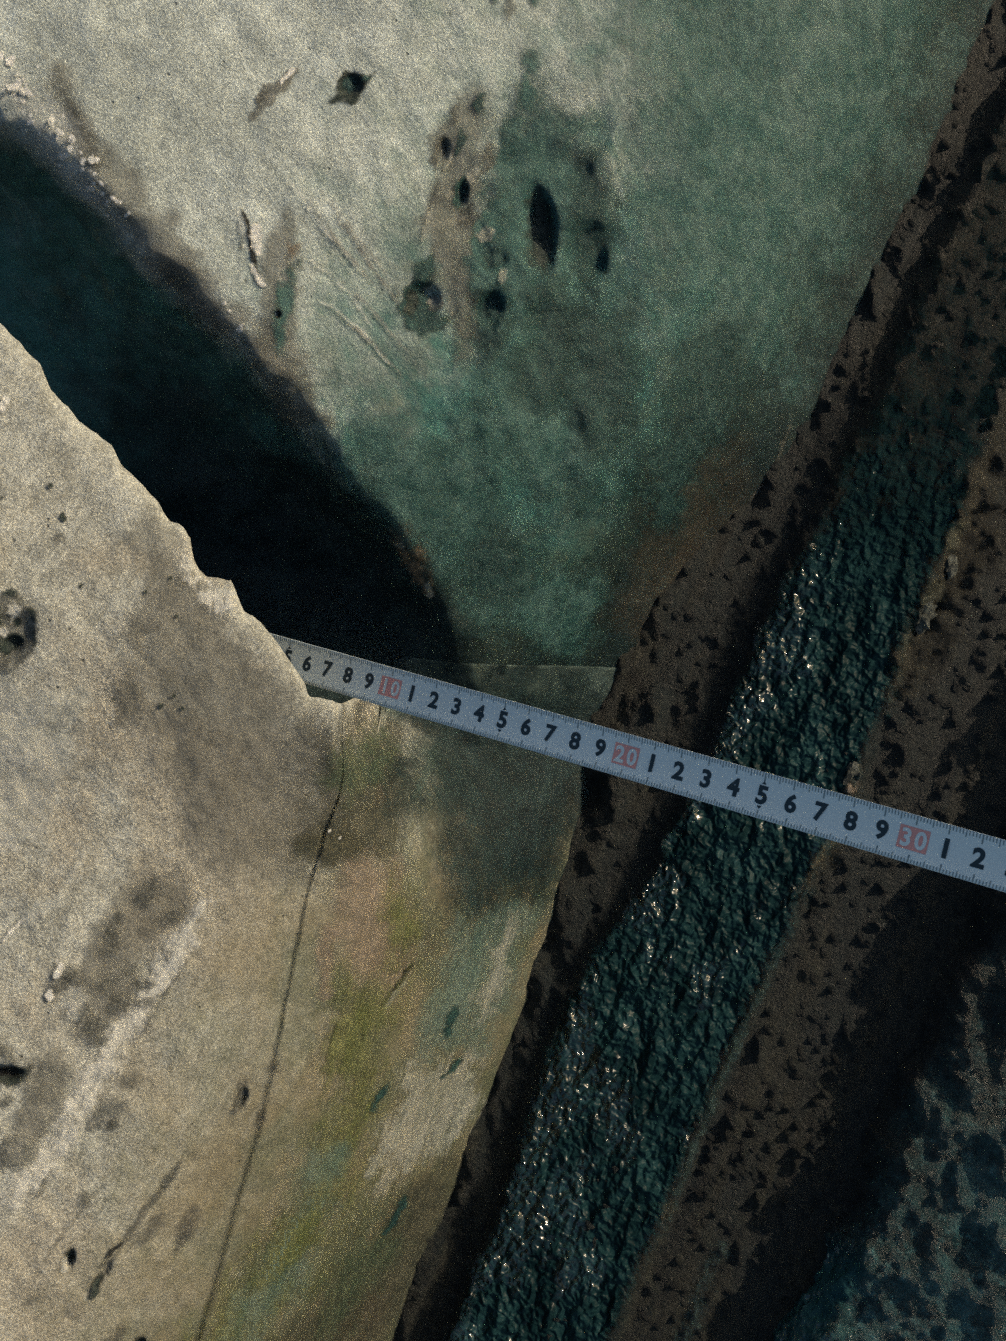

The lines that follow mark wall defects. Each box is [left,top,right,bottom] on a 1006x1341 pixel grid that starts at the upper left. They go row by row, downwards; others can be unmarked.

peeling [249,68,297,121]
spalling [330,70,372,105]
crack [240,210,266,287]
spalling [397,255,449,336]
damp [111,0,995,723]
damp [129,915,199,1033]
spalling [0,1045,59,1107]
damp [324,1007,389,1111]
damp [440,1057,462,1079]
damp [444,1006,459,1037]
peeling [3,1137,38,1170]
damp [297,1162,451,1341]